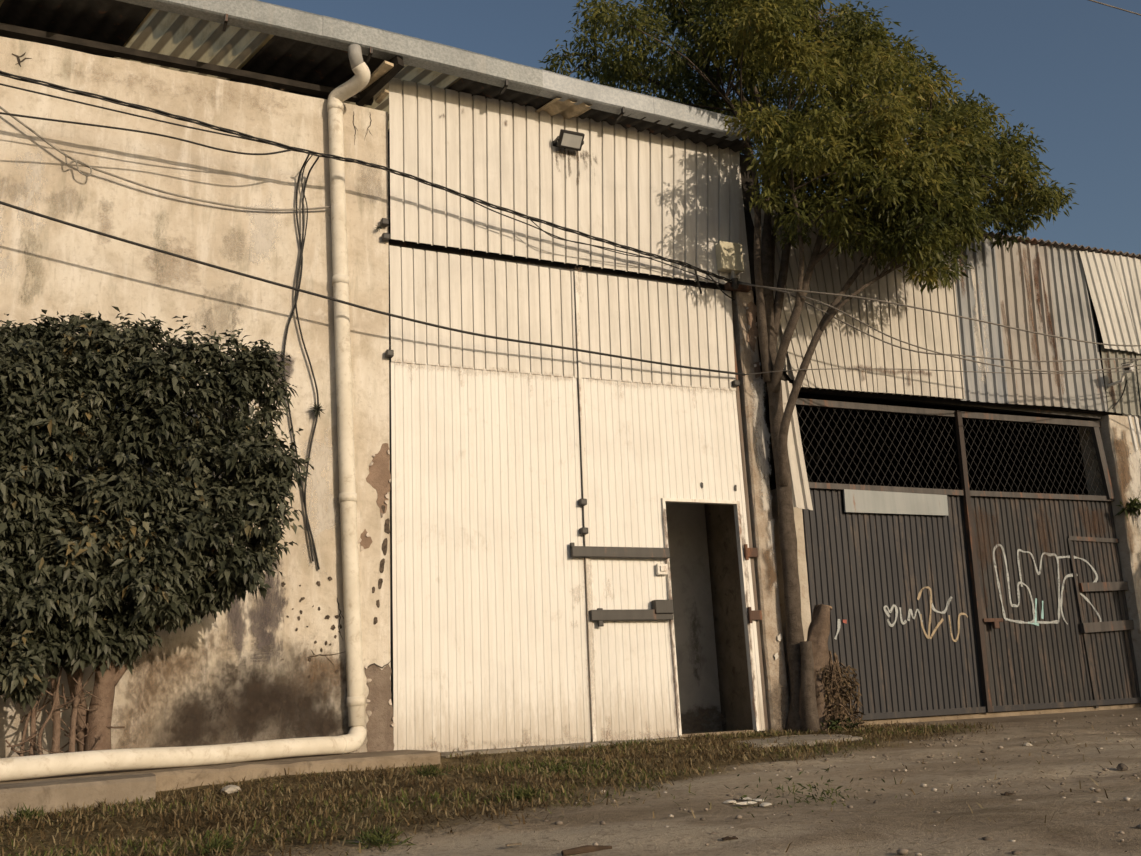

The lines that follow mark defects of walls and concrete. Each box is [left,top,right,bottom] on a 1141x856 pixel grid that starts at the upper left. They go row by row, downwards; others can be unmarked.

rust [1033,253,1060,357]
leakage [306,439,337,564]
peeling [358,443,391,625]
leakage [120,643,214,745]
leakage [155,560,347,748]
spalling [365,661,395,752]